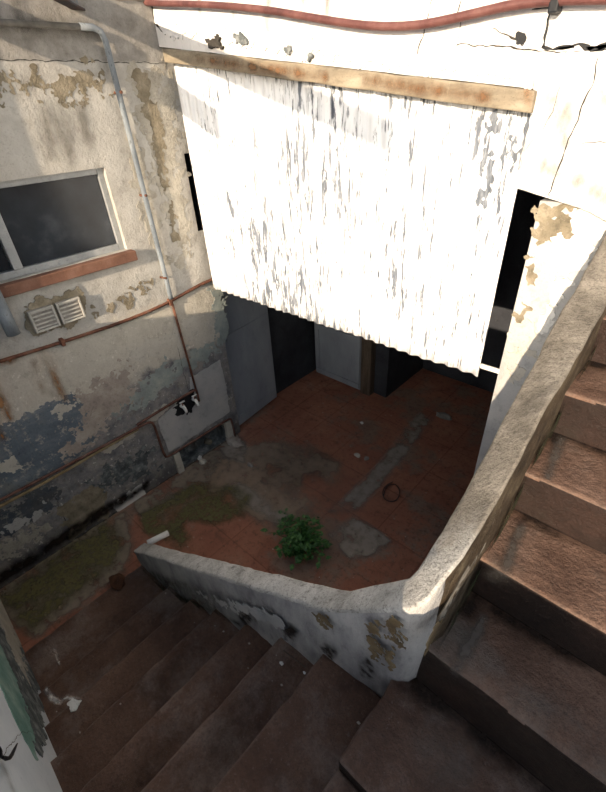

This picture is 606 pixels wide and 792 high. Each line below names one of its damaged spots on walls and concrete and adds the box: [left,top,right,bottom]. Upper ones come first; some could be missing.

flaking render [162,18,462,78]
peeling [0,56,114,109]
crack [456,1,606,194]
peeling [124,47,195,273]
peeling [475,109,530,209]
peeling [90,278,154,319]
peeling [504,203,606,384]
peeling [0,455,24,474]
peeling [311,612,333,630]
peeling [361,615,408,678]
peeling [424,543,486,656]